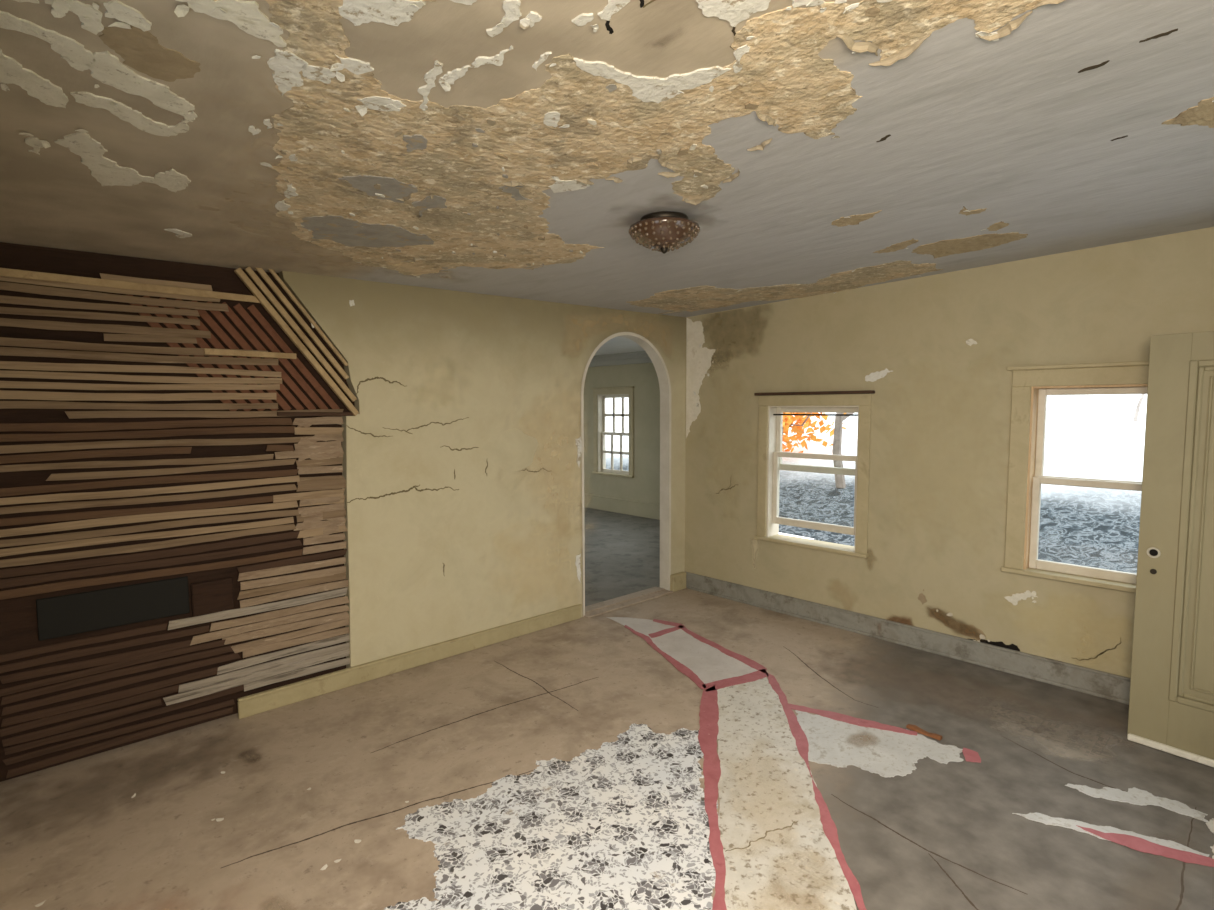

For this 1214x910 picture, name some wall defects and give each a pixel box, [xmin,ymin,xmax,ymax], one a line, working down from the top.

peeling [0,0,201,137]
peeling [19,129,191,193]
peeling [174,0,1065,278]
peeling [1162,97,1214,128]
peeling [164,228,192,238]
peeling [626,221,1028,437]
crack [355,377,404,395]
crack [346,417,488,503]